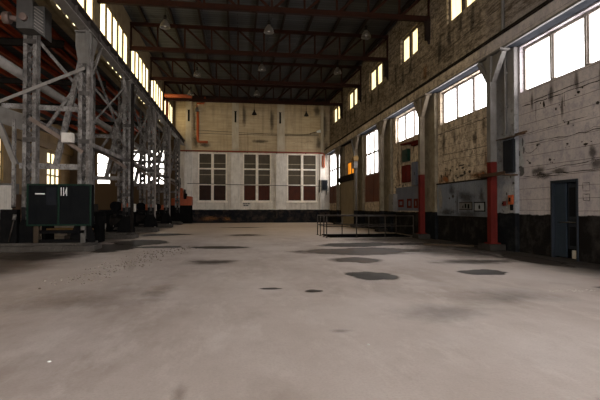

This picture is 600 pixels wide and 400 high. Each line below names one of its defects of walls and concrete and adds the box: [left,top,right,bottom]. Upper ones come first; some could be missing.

water stain [345,272,398,280]